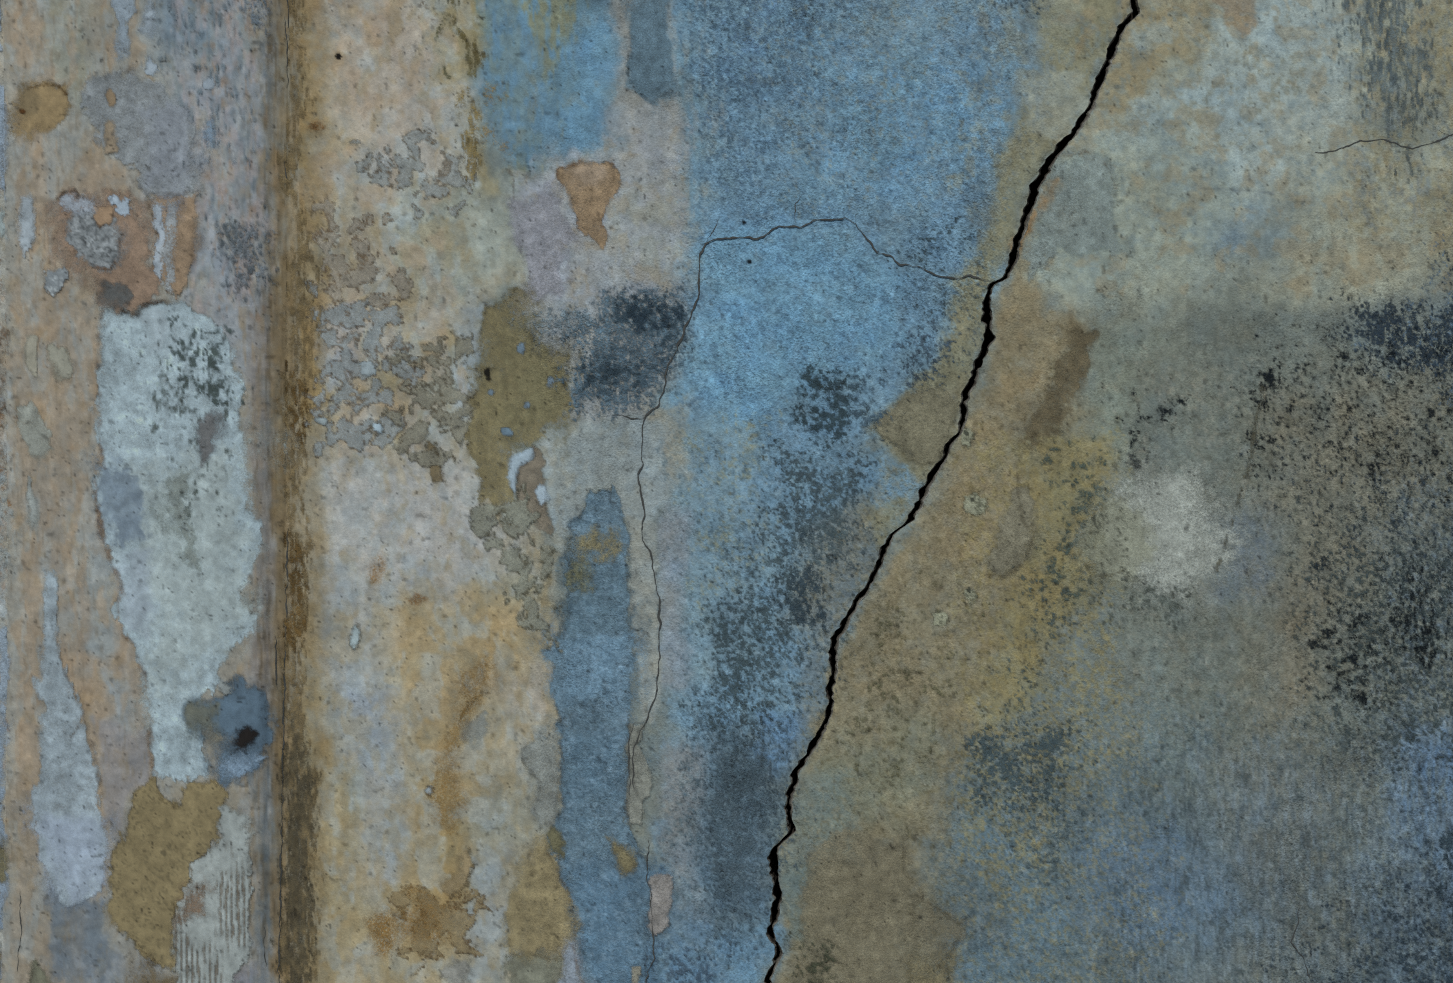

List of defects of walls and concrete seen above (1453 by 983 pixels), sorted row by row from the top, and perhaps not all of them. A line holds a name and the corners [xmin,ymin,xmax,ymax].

peeling [351,130,476,218]
crack [1316,130,1453,153]
peeling [6,0,279,983]
peeling [305,160,673,983]
crack [623,0,1140,983]
damp [1236,240,1453,809]
damp [1261,830,1453,983]